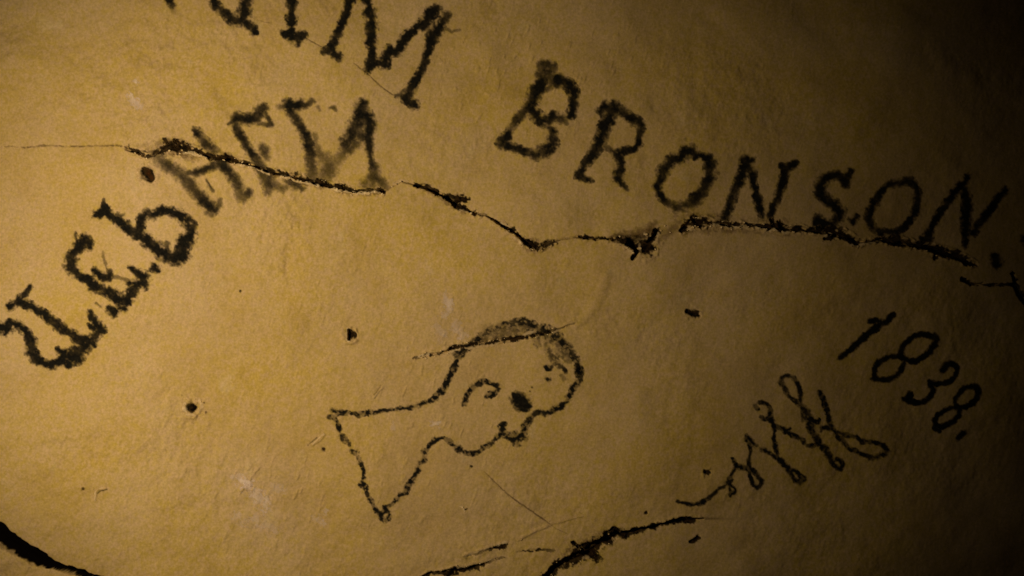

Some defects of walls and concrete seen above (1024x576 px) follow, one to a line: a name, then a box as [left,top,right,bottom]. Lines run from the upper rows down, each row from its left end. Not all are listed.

crack [112,138,556,252]
crack [679,214,1024,304]
crack [423,516,700,576]